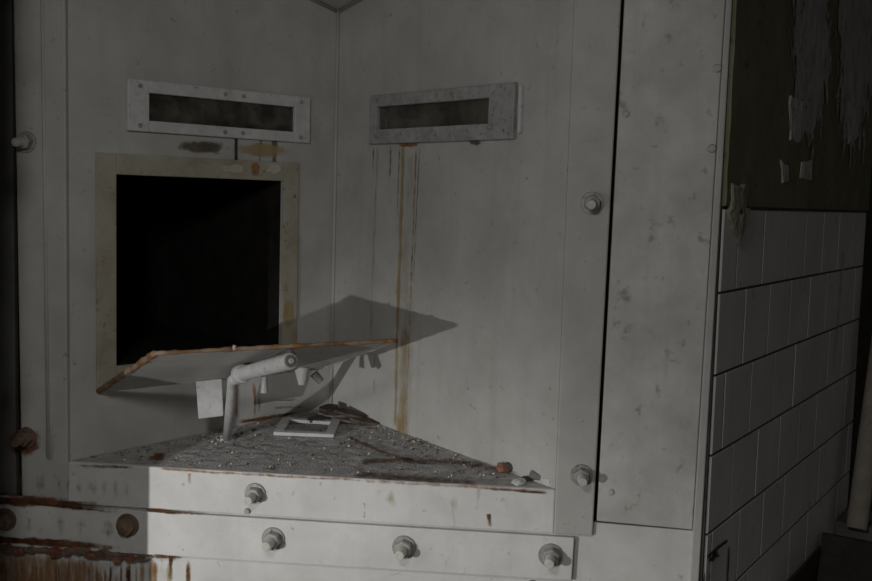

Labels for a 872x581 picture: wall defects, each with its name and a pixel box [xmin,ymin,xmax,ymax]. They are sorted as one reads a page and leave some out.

peeling [789,0,872,180]
corrosion [0,551,177,581]